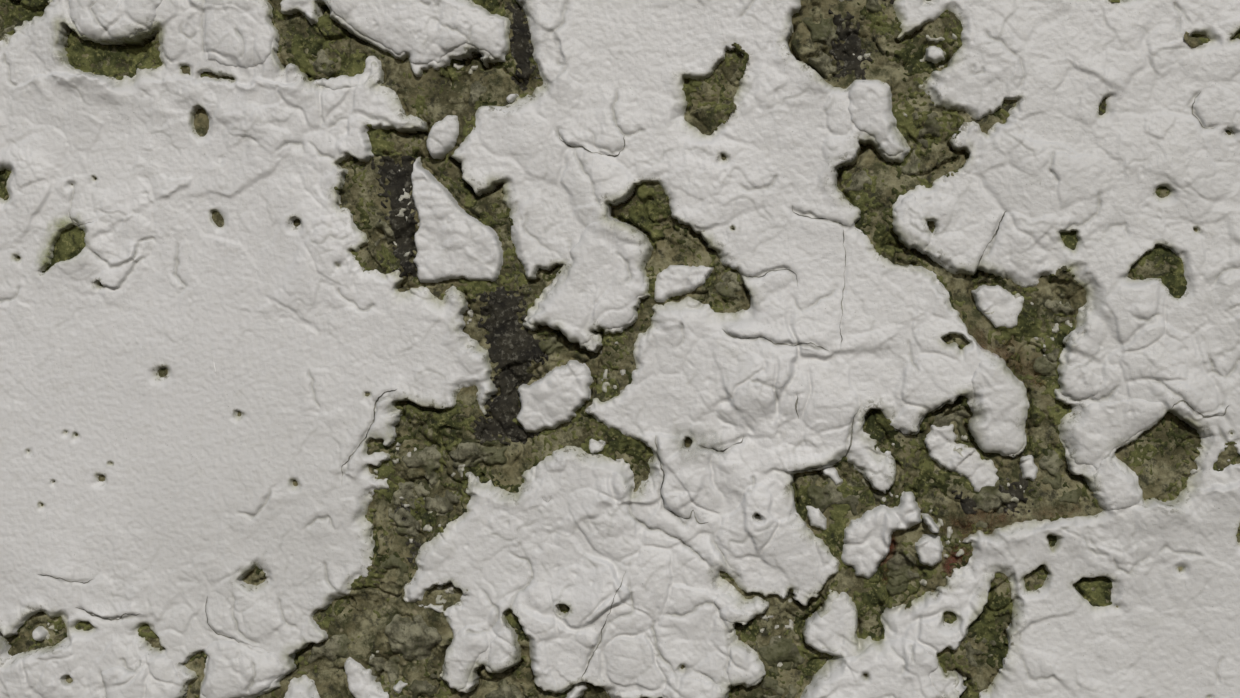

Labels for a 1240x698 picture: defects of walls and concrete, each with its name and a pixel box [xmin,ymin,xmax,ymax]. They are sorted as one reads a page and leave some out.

spalling [180,65,234,80]
spalling [194,108,209,137]
spalling [212,211,224,227]
spalling [42,225,86,273]
crack [724,206,847,350]
spalling [256,0,751,698]
spalling [720,0,1103,698]
spalling [1115,411,1202,502]
spalling [1213,441,1240,472]
spalling [1073,576,1113,607]
spalling [4,612,94,656]
spalling [183,651,207,698]